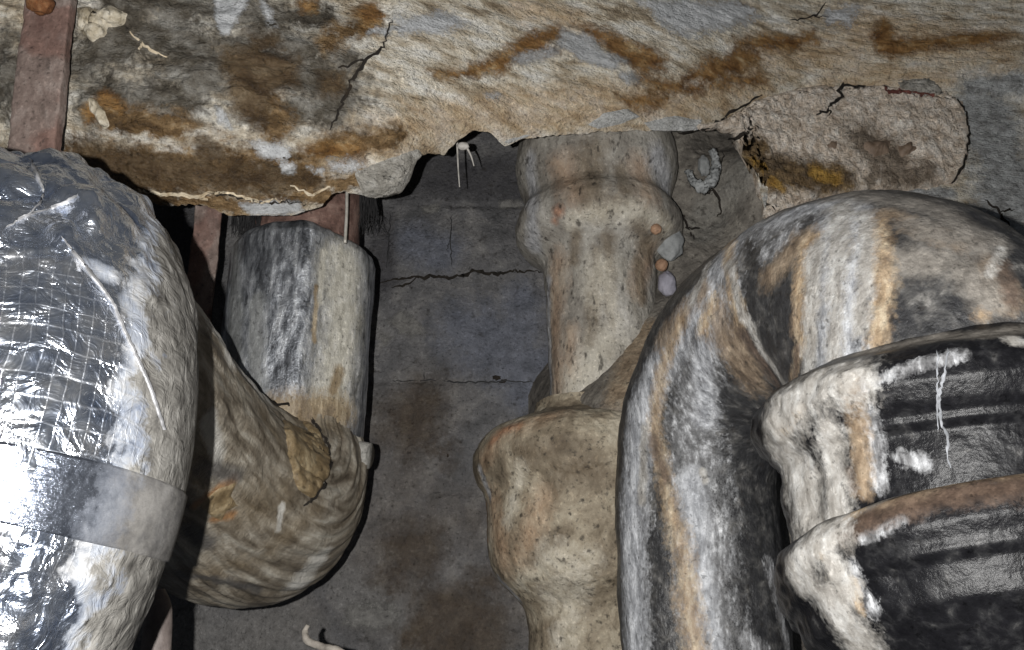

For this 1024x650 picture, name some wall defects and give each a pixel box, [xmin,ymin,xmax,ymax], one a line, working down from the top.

corrosion [81,90,128,123]
crack [330,20,393,130]
corrosion [430,26,562,80]
crack [816,82,866,116]
corrosion [870,17,1006,59]
corrosion [305,137,366,164]
crack [951,99,971,184]
crack [379,215,543,288]